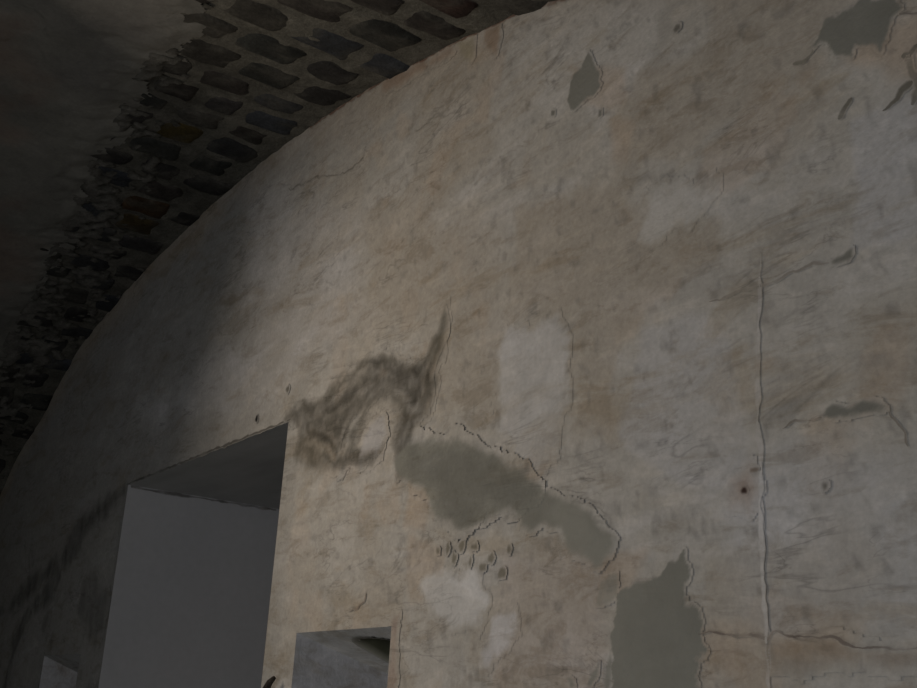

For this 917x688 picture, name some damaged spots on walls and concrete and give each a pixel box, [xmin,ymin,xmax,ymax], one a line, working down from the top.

peeling [792,0,917,66]
peeling [566,50,603,113]
spalling [883,43,917,111]
peeling [634,168,723,250]
spalling [0,0,556,494]
crack [709,244,856,302]
damp [281,296,545,542]
crack [782,395,908,447]
peeling [566,546,710,688]
crack [698,630,917,652]